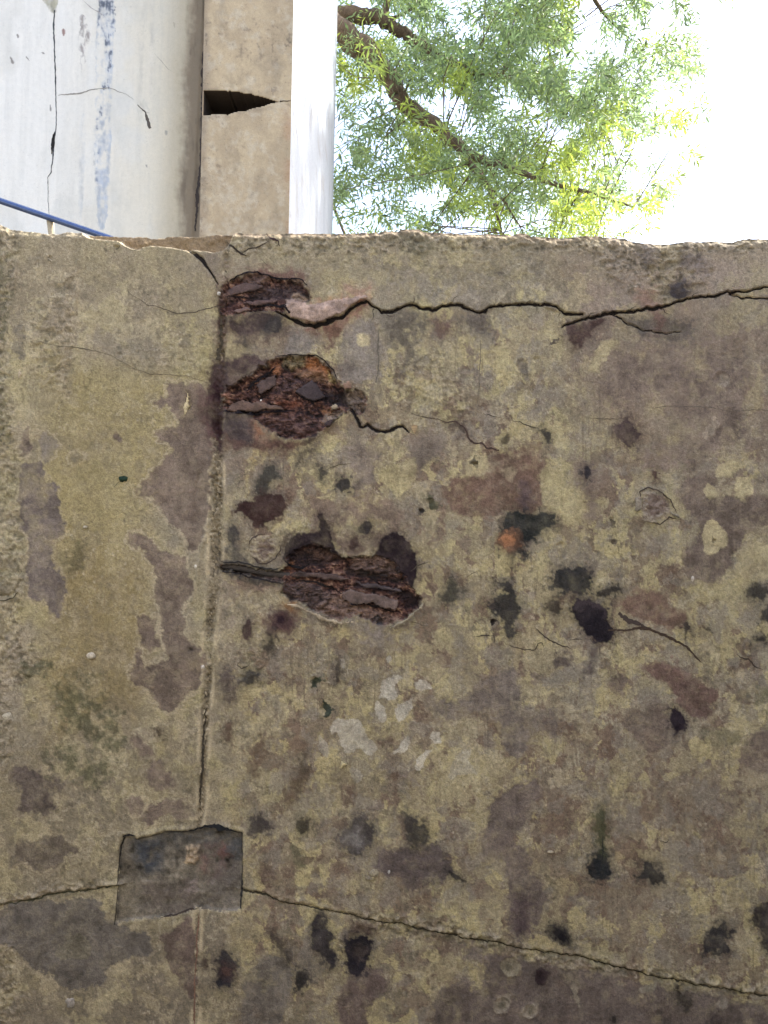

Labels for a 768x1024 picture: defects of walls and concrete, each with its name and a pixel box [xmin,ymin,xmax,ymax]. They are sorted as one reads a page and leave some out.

water stain [75,0,116,221]
crack [47,10,151,209]
crack [38,52,225,383]
corrosion [187,257,377,465]
spalling [218,271,368,323]
spalling [220,354,368,441]
crack [278,286,768,451]
spalling [219,533,425,629]
corrosion [224,482,424,592]
water stain [120,242,768,842]
crack [199,708,207,805]
crack [243,889,767,997]